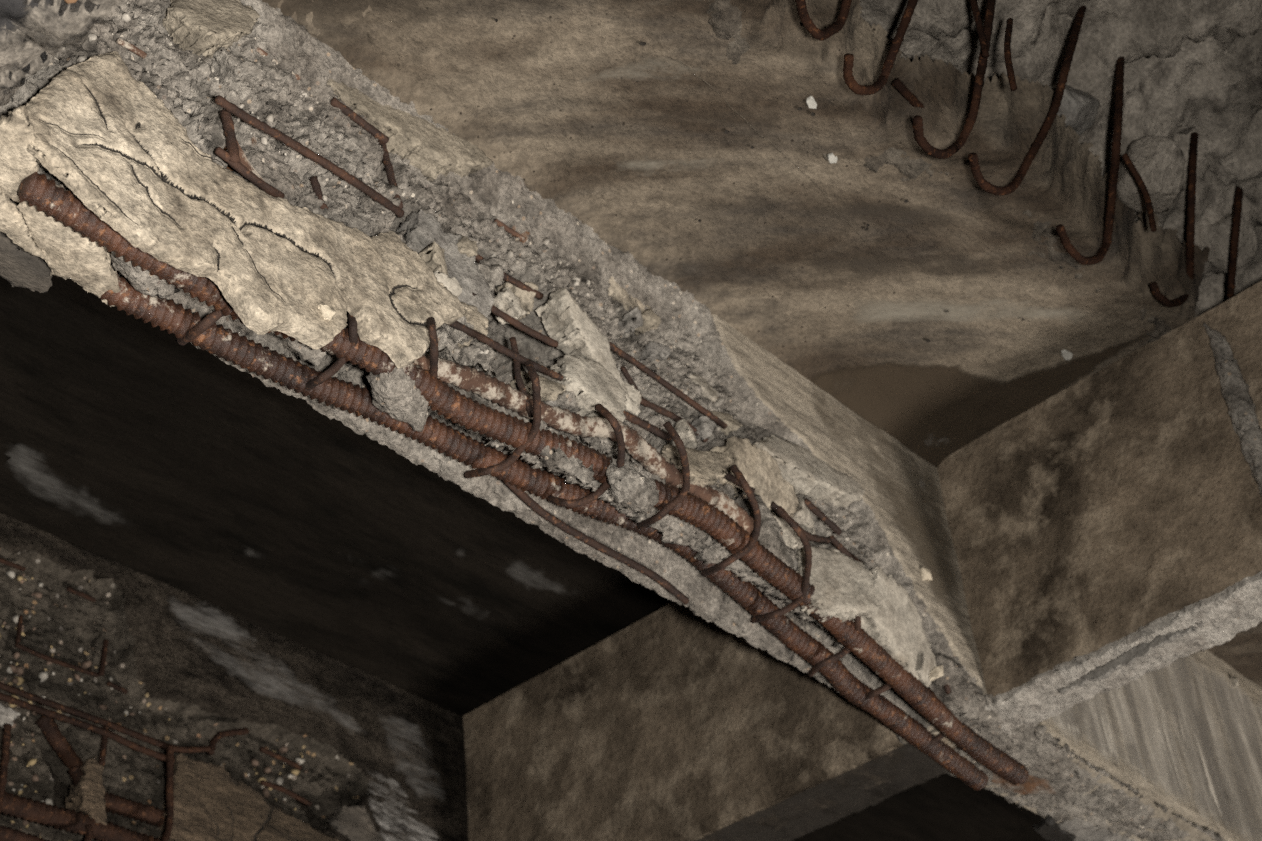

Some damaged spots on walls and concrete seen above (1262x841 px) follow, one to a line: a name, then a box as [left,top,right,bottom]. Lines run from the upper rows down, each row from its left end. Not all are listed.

crack [40,84,336,303]
spalling [843,0,1086,196]
spalling [1022,56,1157,280]
spalling [0,0,1044,790]
spalling [1137,282,1198,345]
spalling [0,548,385,841]
spalling [955,721,1191,841]
spalling [985,571,1262,734]
spalling [1176,813,1225,841]